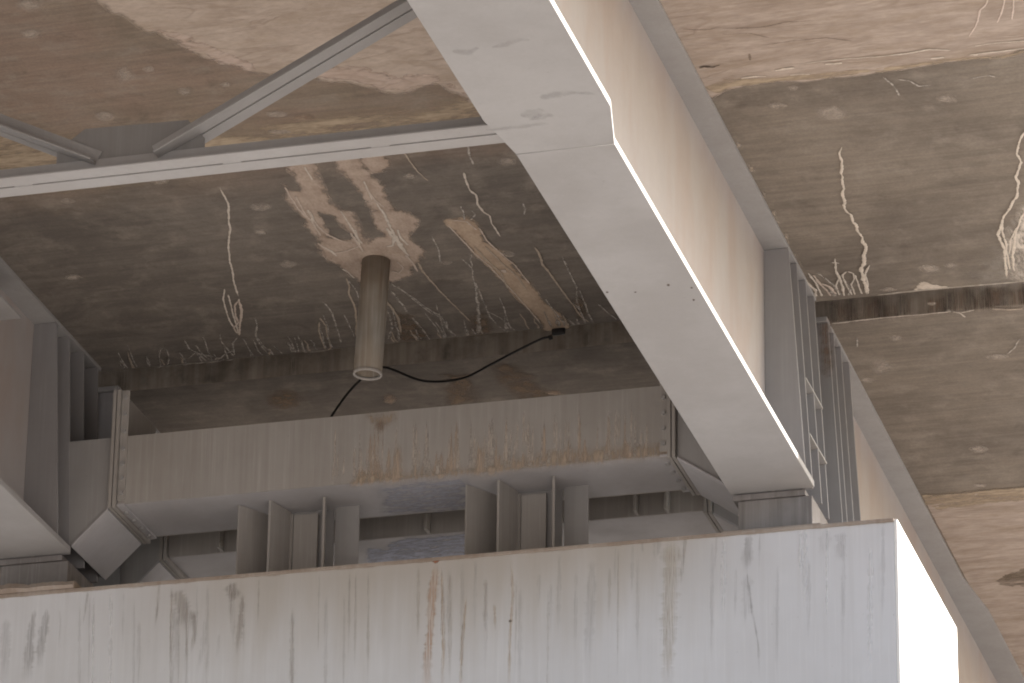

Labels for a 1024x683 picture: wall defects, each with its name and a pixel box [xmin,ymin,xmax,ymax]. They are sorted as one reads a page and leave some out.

crack [156,188,283,368]
crack [315,278,359,352]
crack [387,239,517,341]
crack [460,147,500,236]
crack [534,247,617,324]
crack [806,147,1022,324]
crack [996,132,1024,281]